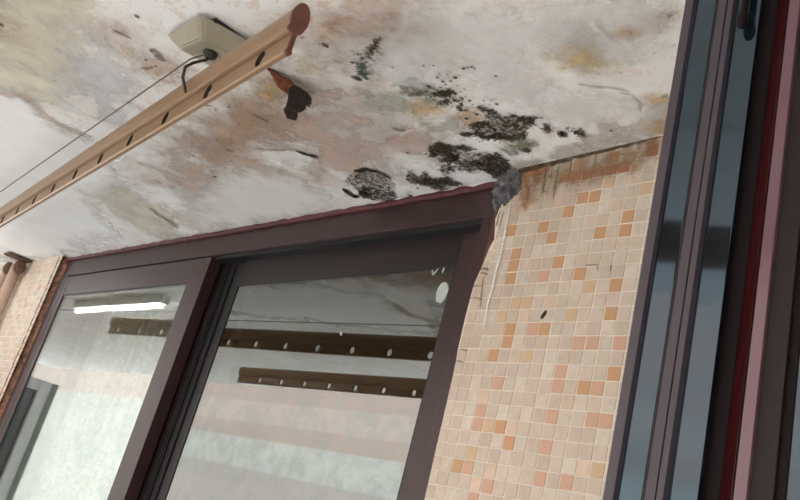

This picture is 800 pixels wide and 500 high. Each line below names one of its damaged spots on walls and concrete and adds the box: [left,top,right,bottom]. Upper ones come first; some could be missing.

damp [0,0,95,102]
damp [350,37,383,81]
peeling [157,68,438,233]
damp [342,65,667,201]